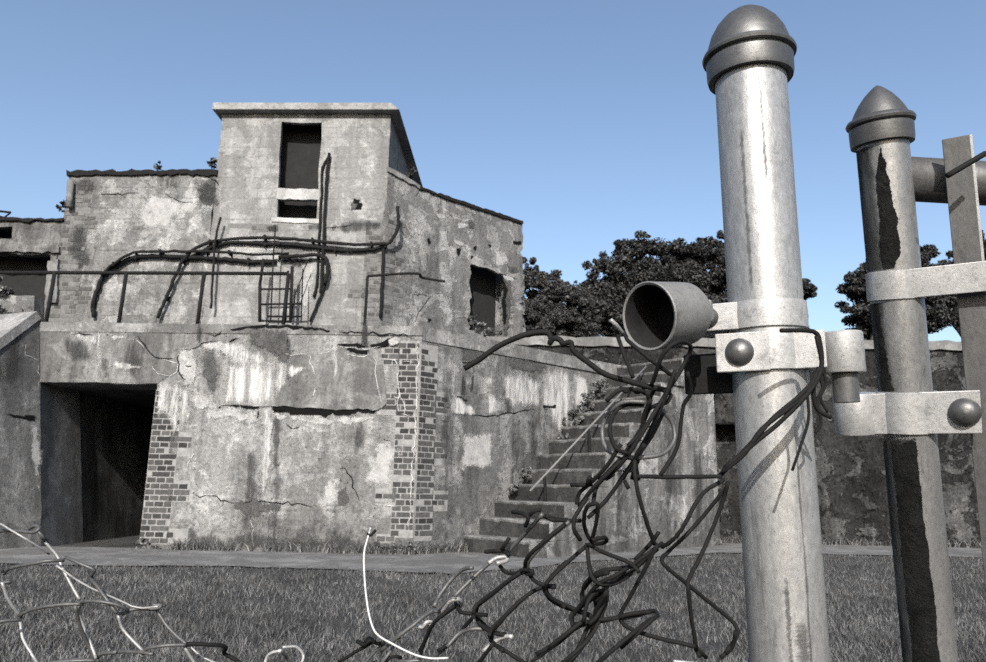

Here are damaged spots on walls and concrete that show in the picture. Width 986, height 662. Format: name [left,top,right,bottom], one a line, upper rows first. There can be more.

spalling [495,249,518,337]
crack [138,332,236,380]
peeling [364,439,403,485]
peeling [460,433,492,470]